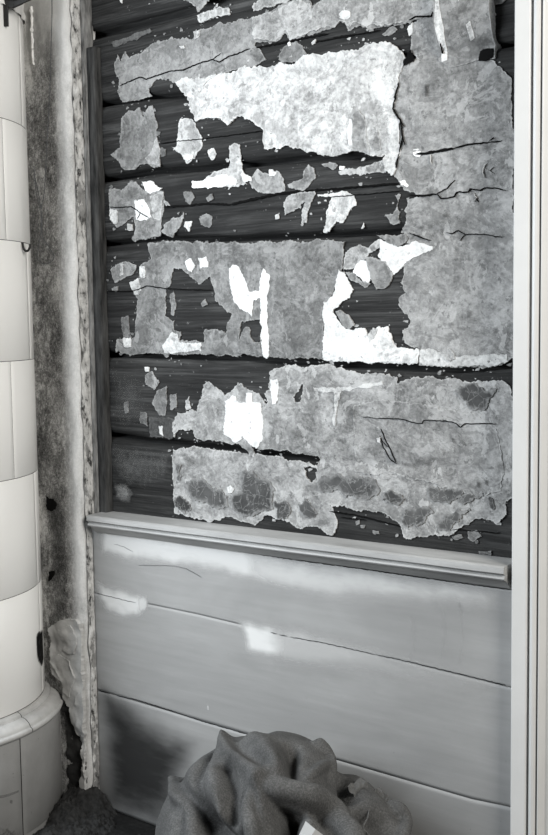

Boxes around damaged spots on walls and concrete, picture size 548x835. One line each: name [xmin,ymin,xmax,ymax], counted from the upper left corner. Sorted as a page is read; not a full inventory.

peeling [252,0,448,62]
crack [120,49,249,86]
peeling [109,181,170,231]
peeling [183,162,345,205]
crack [409,180,506,202]
crack [410,230,503,241]
peeling [343,234,433,290]
peeling [229,265,270,359]
peeling [162,332,202,354]
peeling [368,328,417,364]
peeling [223,393,264,457]
crack [361,416,497,428]